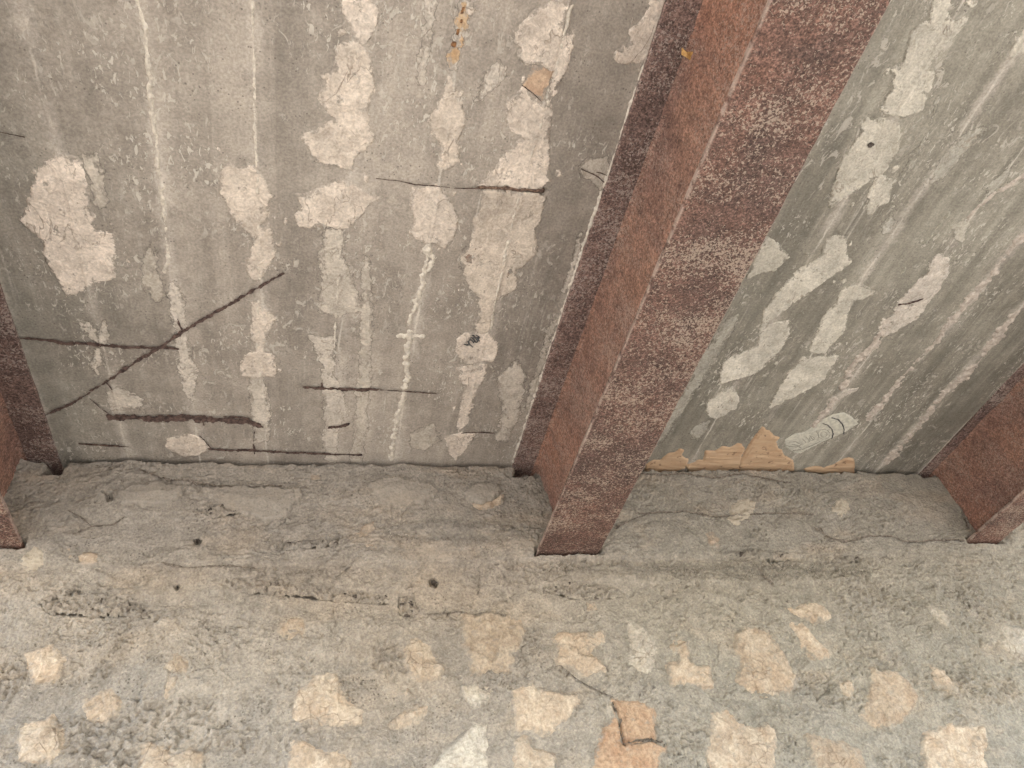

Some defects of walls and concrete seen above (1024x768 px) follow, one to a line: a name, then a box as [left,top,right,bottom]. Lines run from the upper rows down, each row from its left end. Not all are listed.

spalling [19,152,199,403]
crack [20,272,363,456]
spalling [218,0,380,466]
crack [303,383,437,394]
crack [376,178,480,189]
rust [446,0,471,70]
spalling [409,0,575,461]
spalling [657,231,879,444]
spalling [827,0,978,234]
spalling [865,218,970,339]
flaking render [432,611,581,768]
flaking render [592,698,672,768]